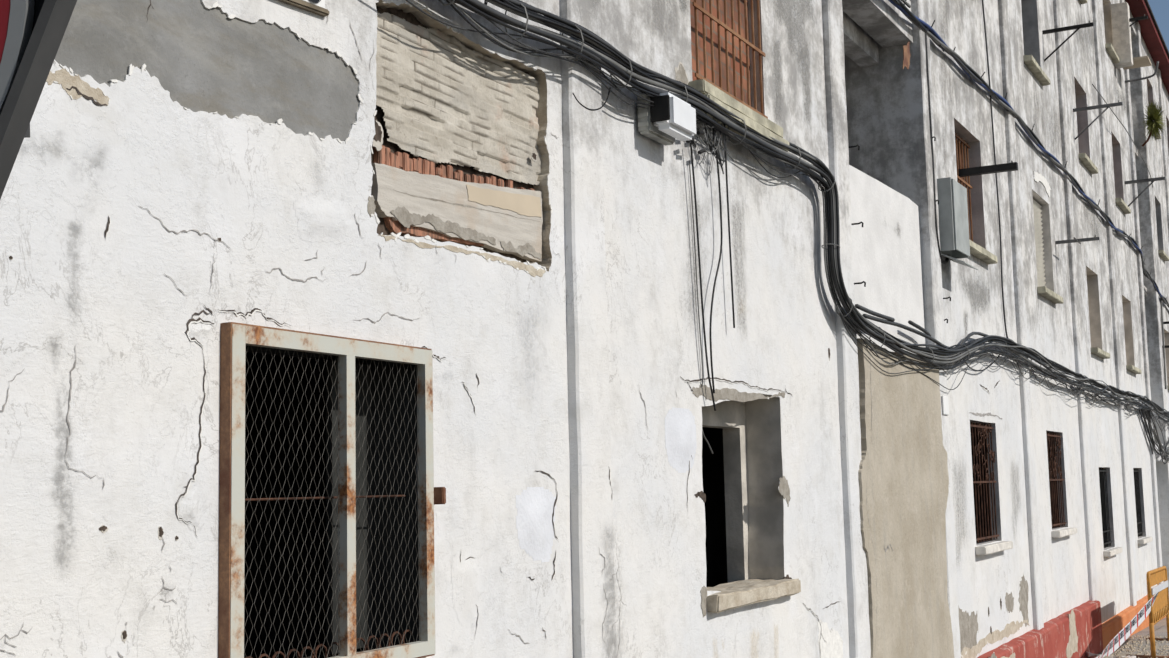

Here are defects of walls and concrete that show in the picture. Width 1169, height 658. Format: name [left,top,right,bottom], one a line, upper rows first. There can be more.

spalling [46,0,553,277]
crack [104,216,112,239]
crack [140,206,291,536]
spalling [692,384,785,402]
peeling [958,575,1030,658]